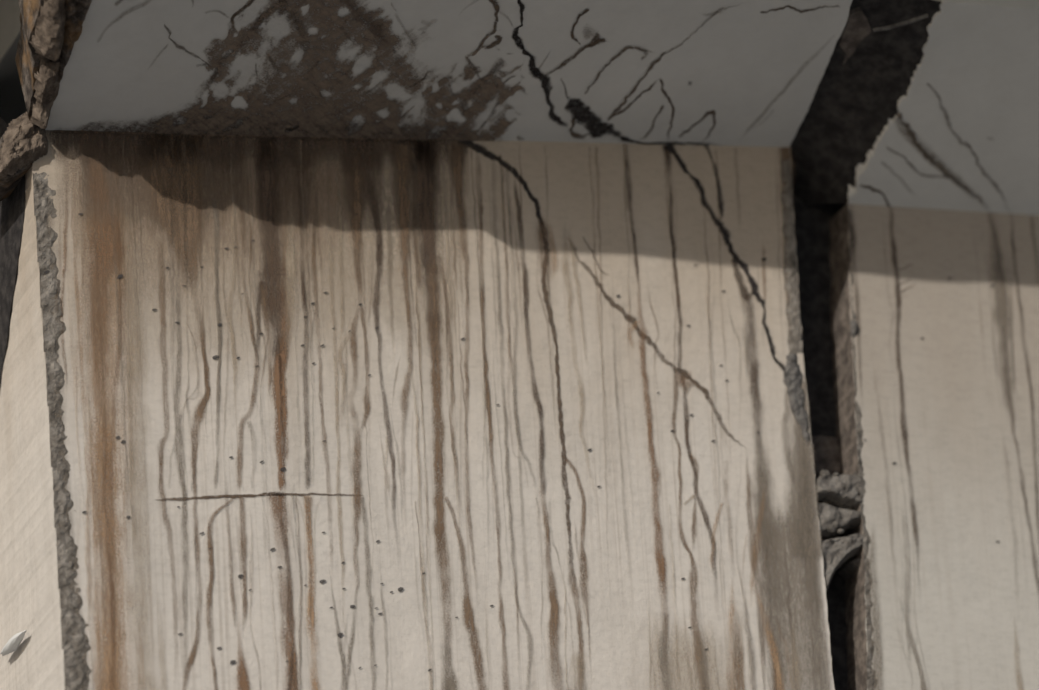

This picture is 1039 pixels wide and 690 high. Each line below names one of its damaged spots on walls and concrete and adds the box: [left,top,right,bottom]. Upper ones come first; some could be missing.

spalling [0,0,92,690]
corrosion [91,213,142,690]
damp [47,0,525,690]
crack [442,121,587,686]
damp [543,506,559,676]
crack [464,0,785,407]
damp [639,318,666,591]
crack [581,263,734,439]
damp [673,359,716,618]
corrosion [734,634,743,690]
spalling [780,159,813,447]
spalling [848,208,878,690]